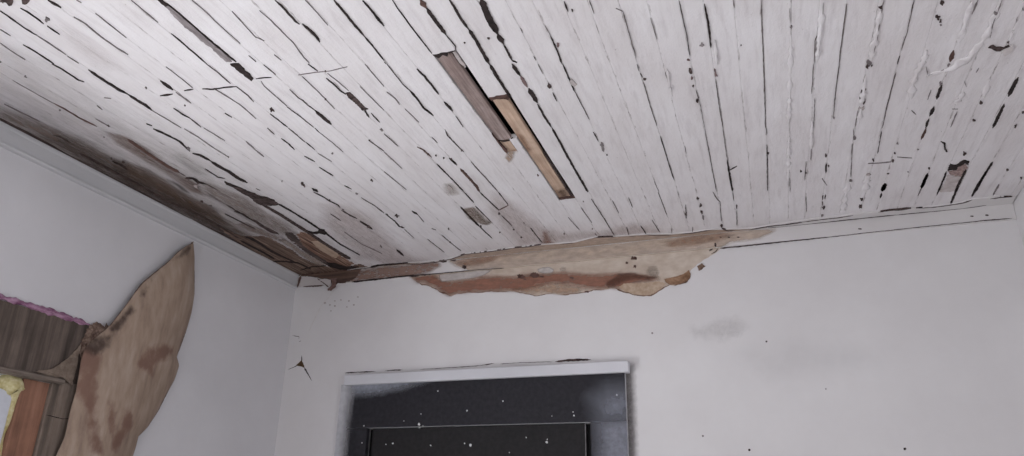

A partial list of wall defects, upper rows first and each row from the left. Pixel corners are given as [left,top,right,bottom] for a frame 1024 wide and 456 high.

spalling [433,50,466,68]
spalling [492,133,513,161]
spalling [544,149,575,200]
damp [2,113,324,266]
peeling [464,208,490,225]
peeling [619,281,666,296]